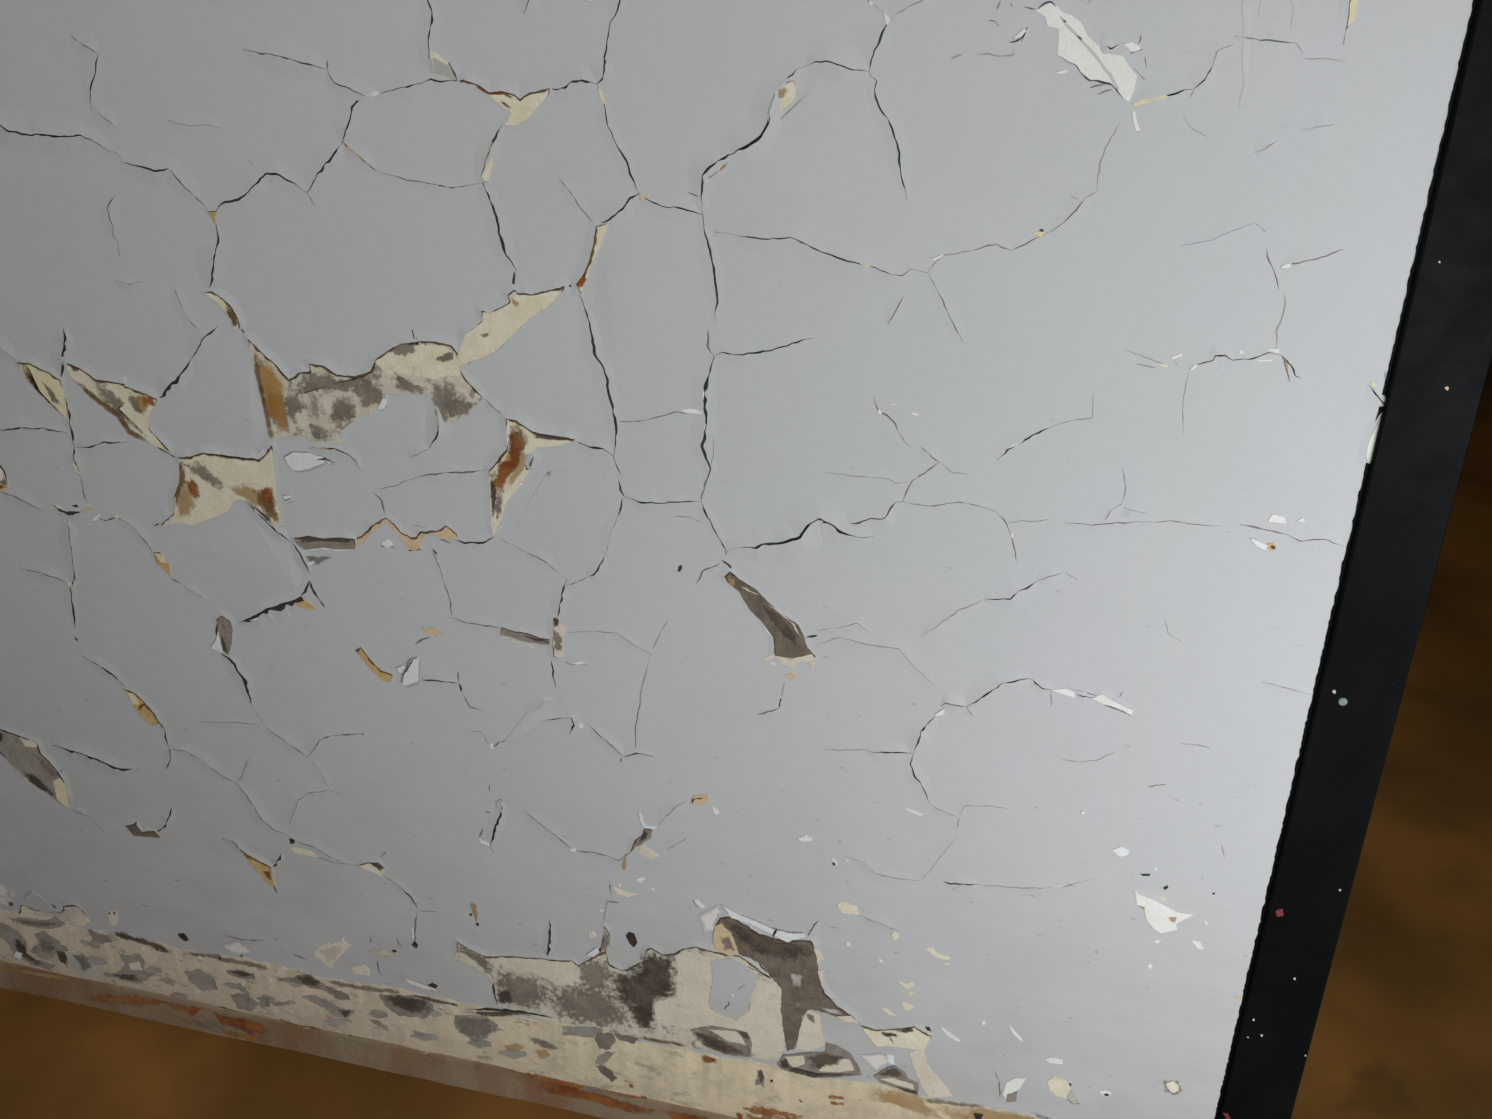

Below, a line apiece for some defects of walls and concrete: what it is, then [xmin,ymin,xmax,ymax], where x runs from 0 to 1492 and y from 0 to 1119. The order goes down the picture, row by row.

peeling [986,0,1168,131]
crack [0,0,519,403]
peeling [12,219,615,688]
crack [421,0,1346,898]
crack [1364,372,1386,410]
crack [0,326,364,837]
peeling [717,560,820,679]
flaking render [0,911,162,984]
water stain [190,953,266,968]
water stain [330,981,457,1006]
flaking render [170,834,960,1098]
water stain [629,956,682,1046]